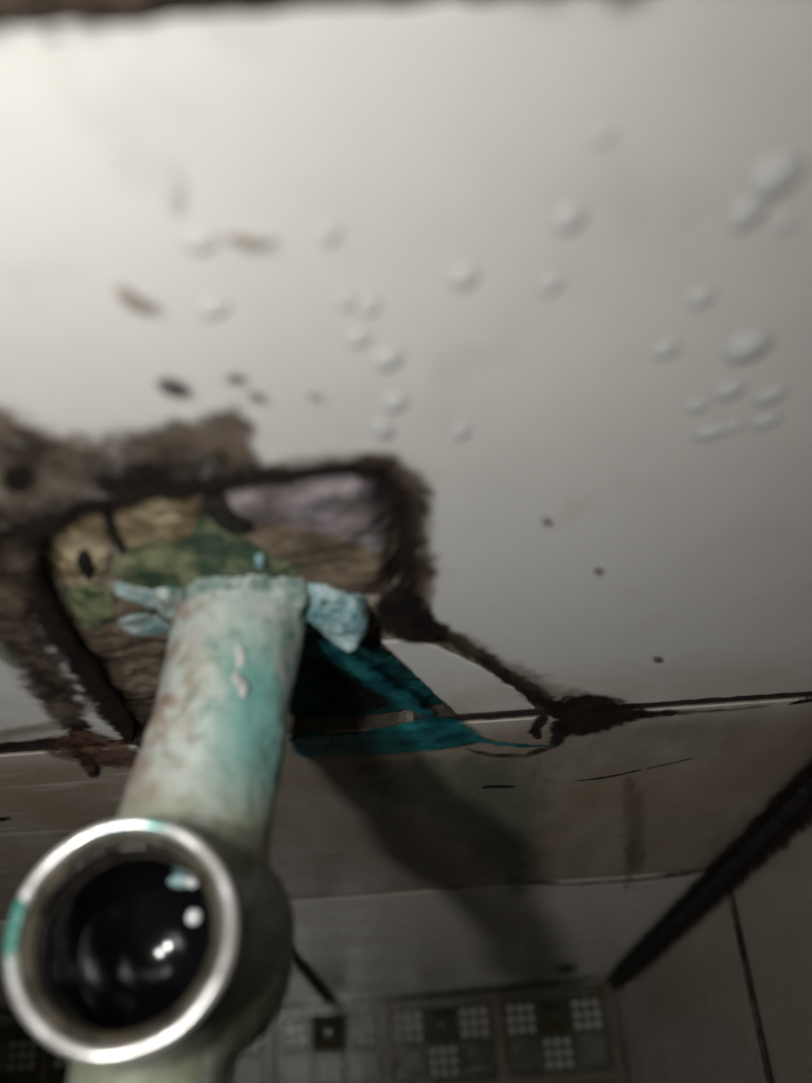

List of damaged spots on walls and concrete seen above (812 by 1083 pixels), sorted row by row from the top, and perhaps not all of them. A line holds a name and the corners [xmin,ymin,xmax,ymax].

damp [156,378,187,397]
damp [0,410,439,775]
spalling [34,473,444,723]
rust [47,730,139,778]
crack [414,617,569,758]
crack [482,783,515,791]